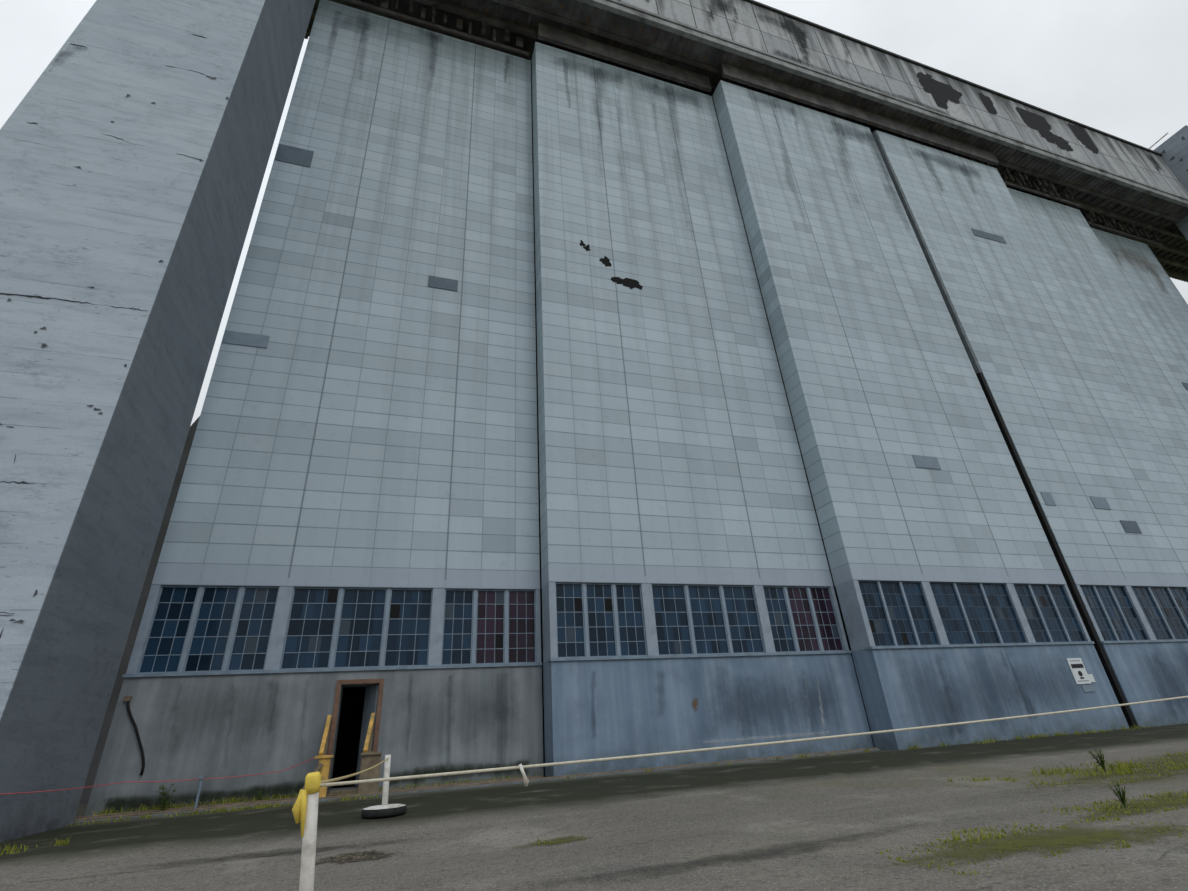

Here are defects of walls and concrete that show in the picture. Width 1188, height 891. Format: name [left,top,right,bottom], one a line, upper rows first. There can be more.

damp [710,0,730,17]
damp [778,20,808,63]
peeling [917,72,962,109]
peeling [978,92,997,114]
peeling [1016,107,1099,154]
crack [0,293,147,311]